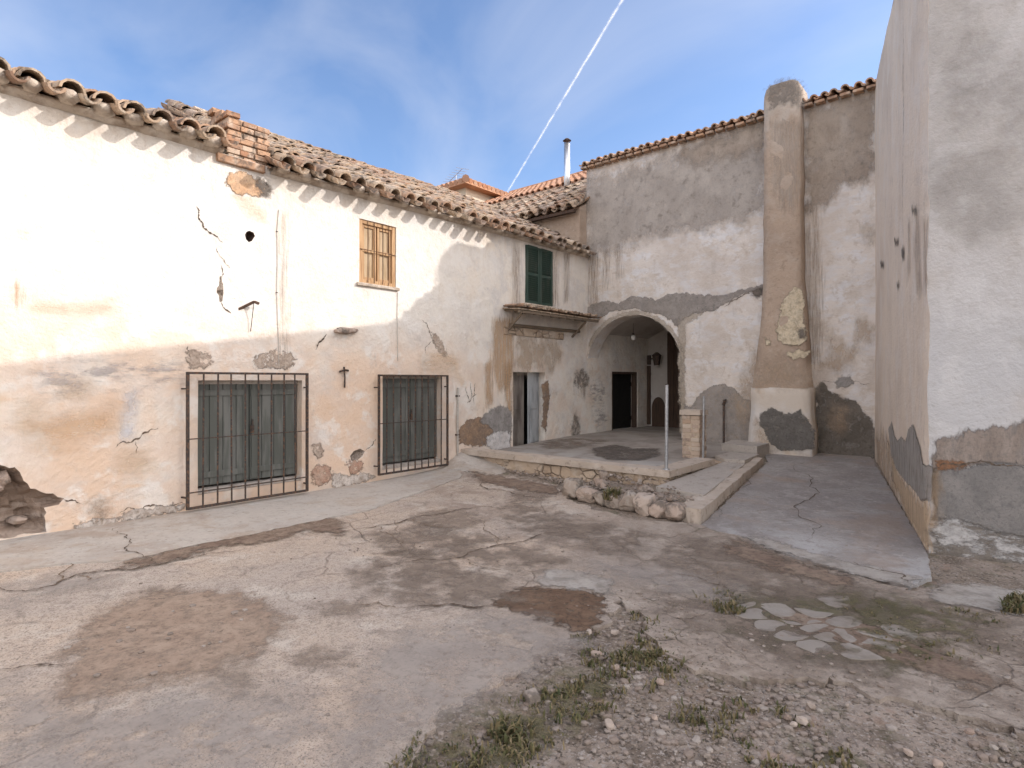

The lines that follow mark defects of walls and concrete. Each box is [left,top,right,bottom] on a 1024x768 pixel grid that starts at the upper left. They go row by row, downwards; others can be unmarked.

flaking render [226,171,264,197]
crack [197,207,230,268]
flaking render [765,287,810,360]
flaking render [185,347,214,369]
flaking render [253,350,296,370]
spalling [0,465,79,539]
crack [117,428,158,453]
flaking render [311,439,376,487]
spalling [459,406,512,450]
flaking render [886,422,933,552]
crack [0,529,244,591]
efflorescence [929,516,1024,564]